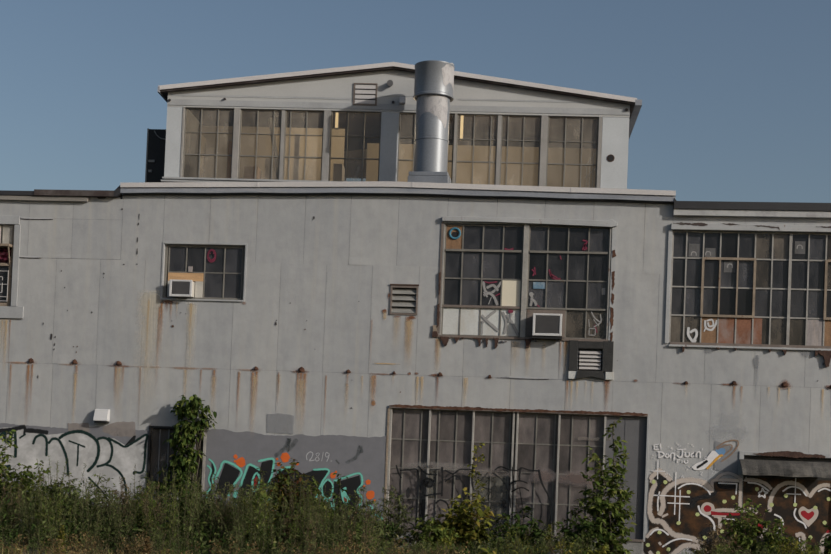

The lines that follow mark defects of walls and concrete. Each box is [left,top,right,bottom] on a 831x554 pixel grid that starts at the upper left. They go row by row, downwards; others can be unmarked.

corrosion [432,272,463,353]
corrosion [10,358,34,390]
corrosion [294,367,306,393]
corrosion [815,350,831,367]